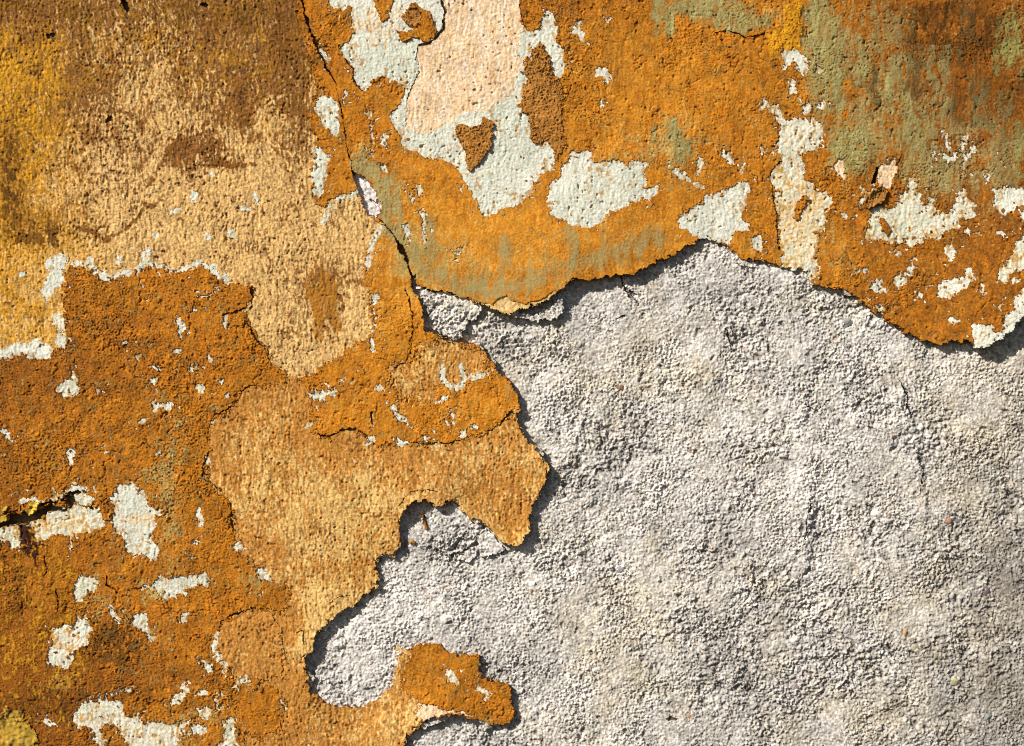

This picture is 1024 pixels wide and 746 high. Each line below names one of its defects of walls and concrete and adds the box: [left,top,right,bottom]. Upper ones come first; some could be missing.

crack [301,0,363,176]
peeling [321,0,665,232]
peeling [852,156,984,258]
crack [379,219,417,369]
peeling [850,257,918,298]
peeling [913,267,987,303]
peeling [120,333,180,429]
crack [317,411,374,442]
crack [411,410,514,445]
crack [0,490,103,527]
peeling [0,473,216,623]
peeling [69,680,240,746]